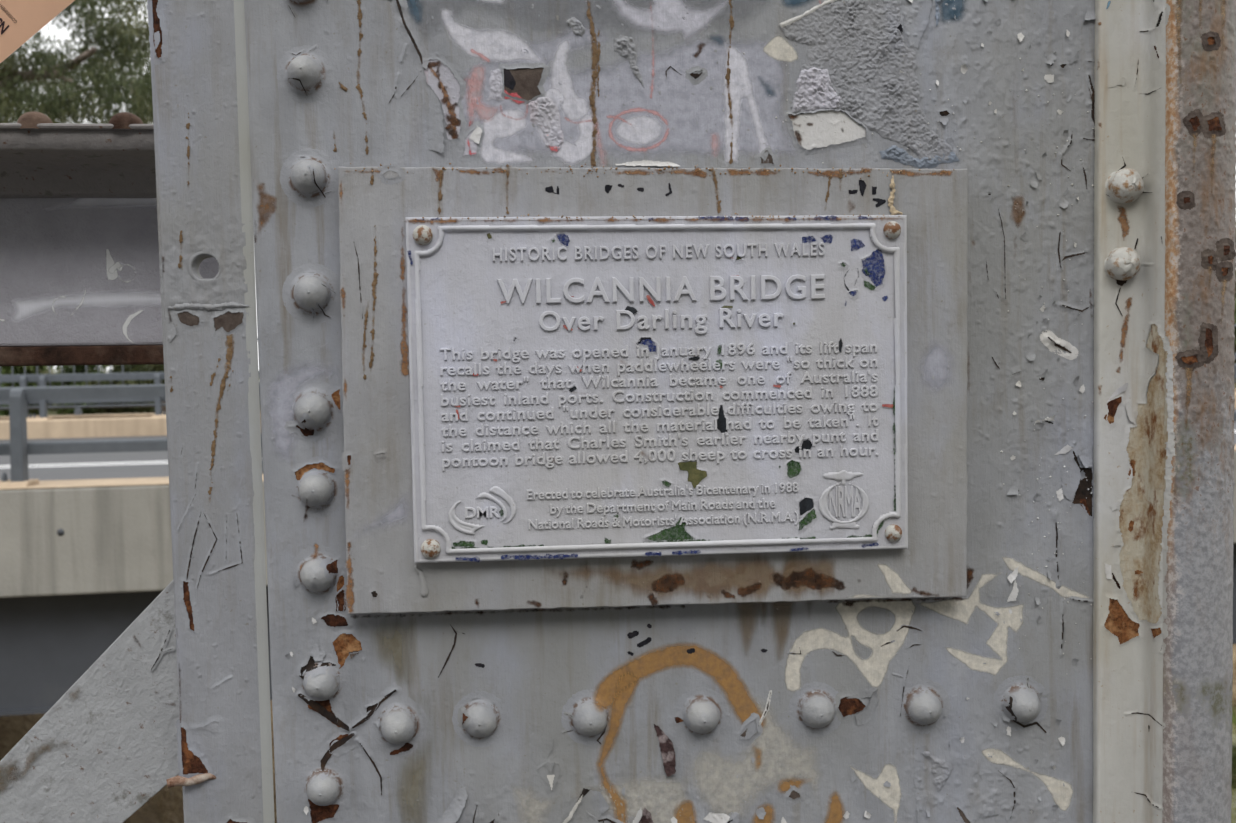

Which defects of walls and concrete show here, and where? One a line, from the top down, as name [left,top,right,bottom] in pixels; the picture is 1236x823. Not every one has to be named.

peeling [418,53,485,161]
peeling [487,62,564,152]
corrosion [587,2,601,166]
corrosion [653,0,789,222]
spalling [779,0,960,169]
corrosion [409,169,457,224]
corrosion [208,334,234,495]
corrosion [363,225,379,380]
peeling [1033,415,1094,523]
peeling [1098,316,1175,650]
corrosion [1175,322,1219,424]
peeling [292,553,391,758]